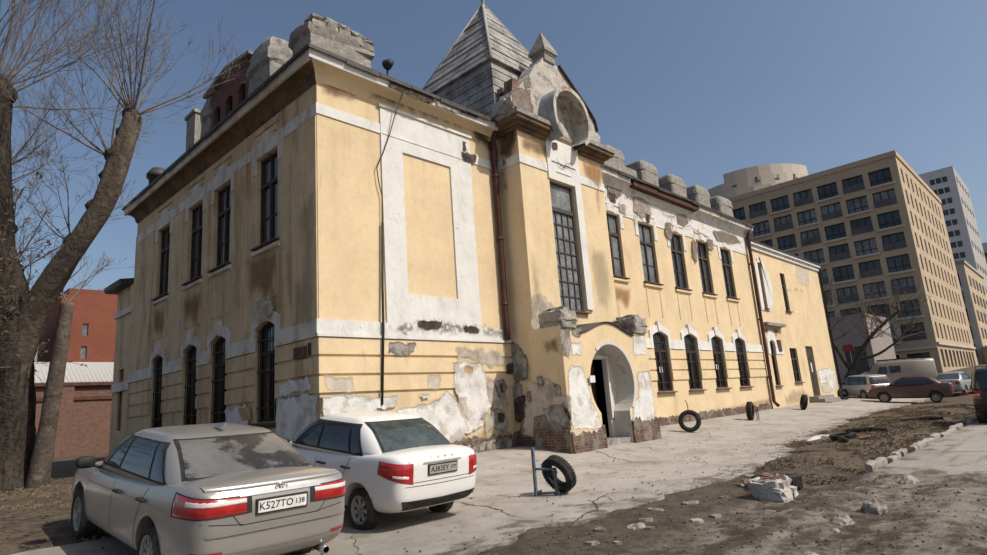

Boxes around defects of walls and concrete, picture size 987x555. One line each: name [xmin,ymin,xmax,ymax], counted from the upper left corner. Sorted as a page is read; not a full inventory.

spalling [502,74,533,115]
spalling [607,185,651,223]
spalling [665,214,689,240]
spalling [692,230,740,263]
spalling [531,292,556,330]
peeling [275,327,602,451]
peeling [632,371,656,423]
peeling [818,367,837,394]